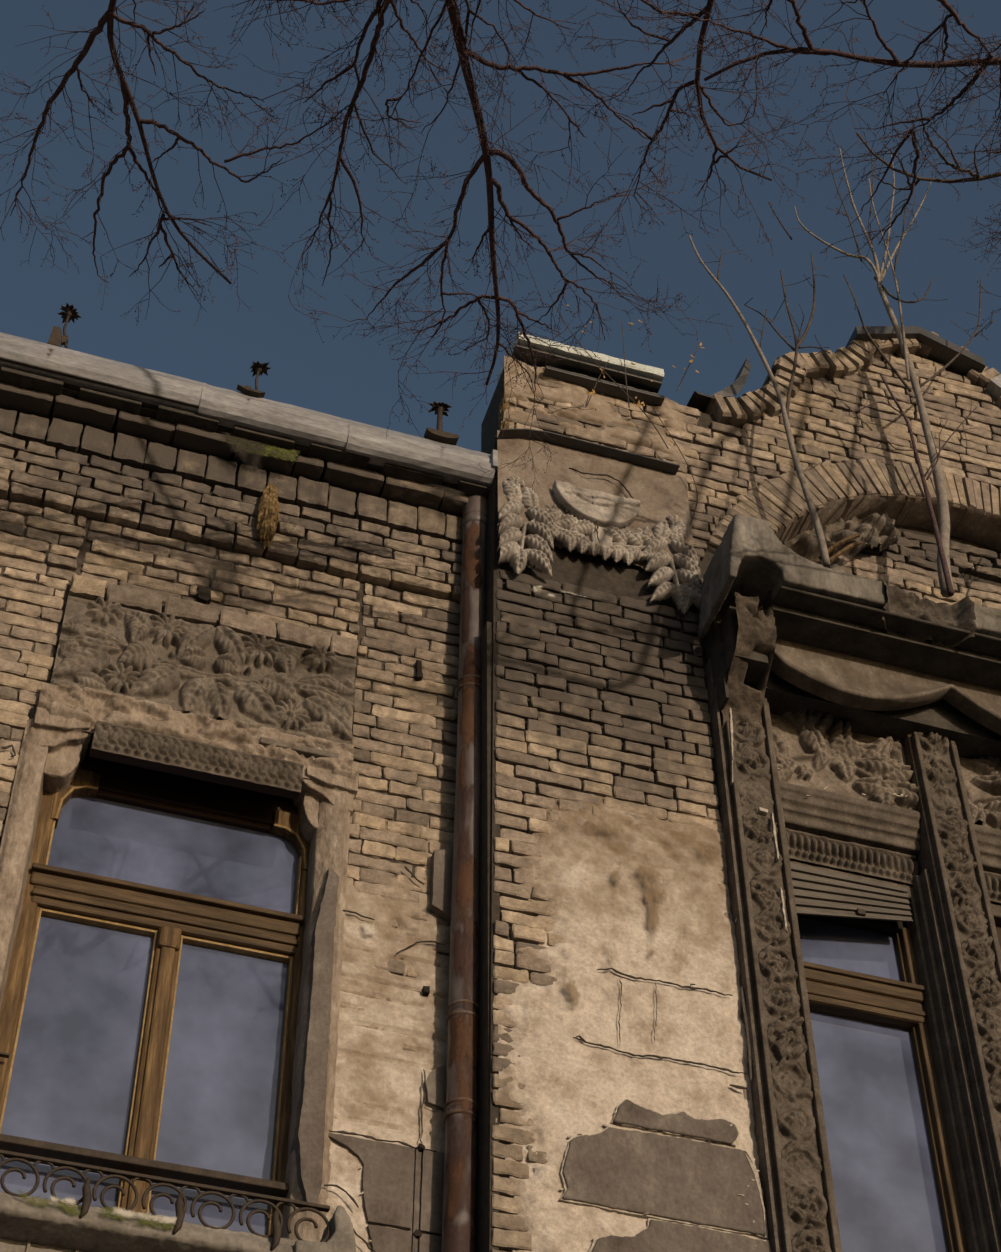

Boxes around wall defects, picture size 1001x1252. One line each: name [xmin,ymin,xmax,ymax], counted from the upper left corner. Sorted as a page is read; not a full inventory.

corrosion [444,520,482,1252]
peeling [758,807,779,862]
peeling [779,887,788,932]
spalling [325,816,453,1252]
spalling [496,796,771,1252]
crack [573,968,748,1089]
crack [328,1069,443,1152]
crack [324,1184,375,1252]